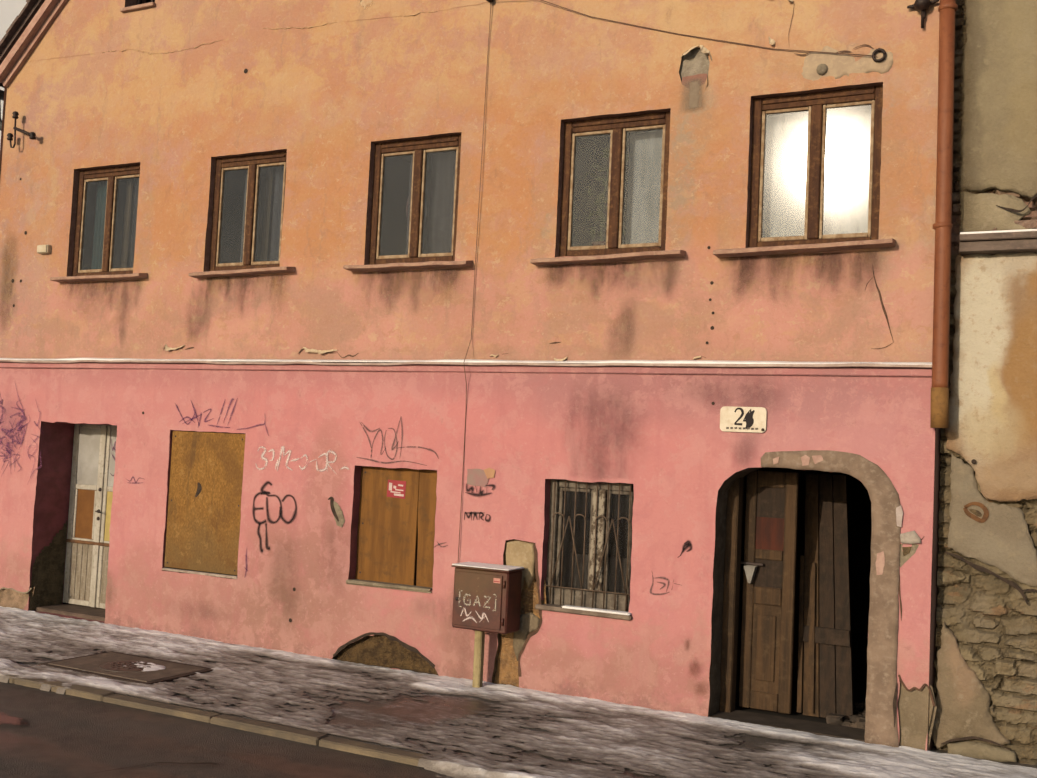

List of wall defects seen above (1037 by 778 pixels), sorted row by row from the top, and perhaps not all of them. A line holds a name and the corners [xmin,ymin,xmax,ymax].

spalling [680,45,712,109]
crack [865,264,893,349]
peeling [801,455,823,466]
spalling [0,520,67,611]
peeling [876,551,885,575]
flaking render [896,505,925,619]
spalling [333,632,439,676]
spalling [494,539,546,687]